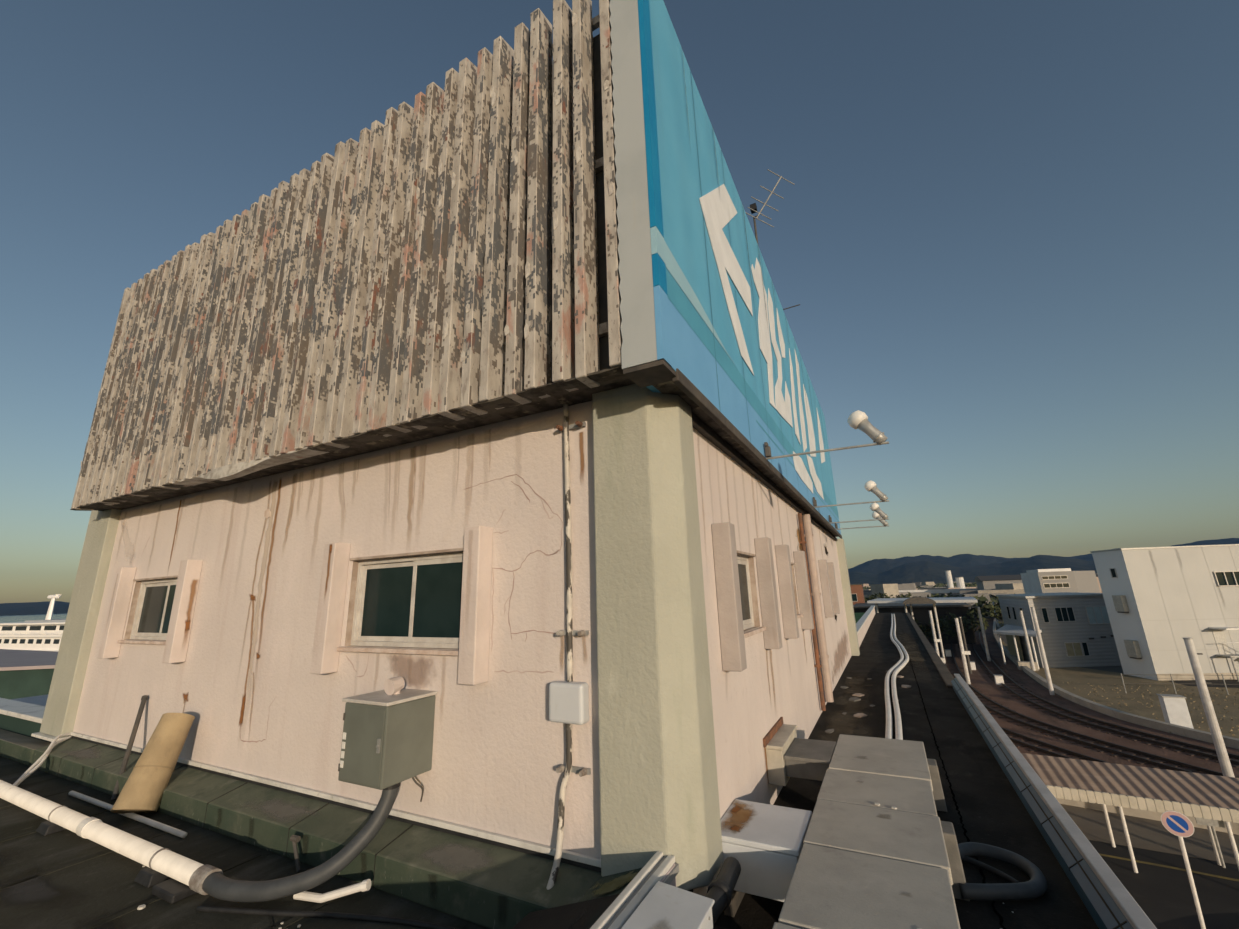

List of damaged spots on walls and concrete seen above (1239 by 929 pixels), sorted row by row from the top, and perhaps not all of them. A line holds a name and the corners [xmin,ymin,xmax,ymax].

peeling [79,0,620,501]
rust [239,476,295,724]
crack [463,474,563,674]
crack [909,656,1014,929]